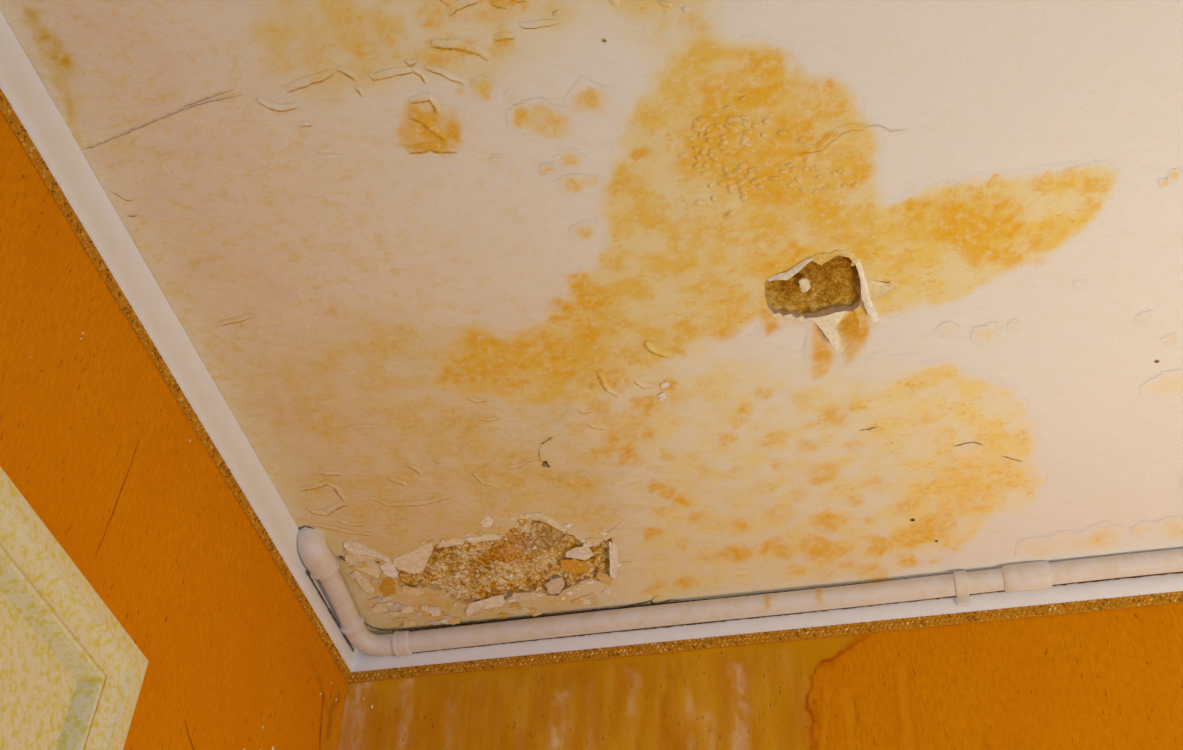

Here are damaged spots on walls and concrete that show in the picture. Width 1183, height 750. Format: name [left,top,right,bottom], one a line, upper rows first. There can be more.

crack [82,90,246,150]
peeling [371,59,468,154]
leakage [199,0,1121,634]
spalling [765,249,895,354]
flaking render [343,512,633,628]
leakage [308,633,879,750]